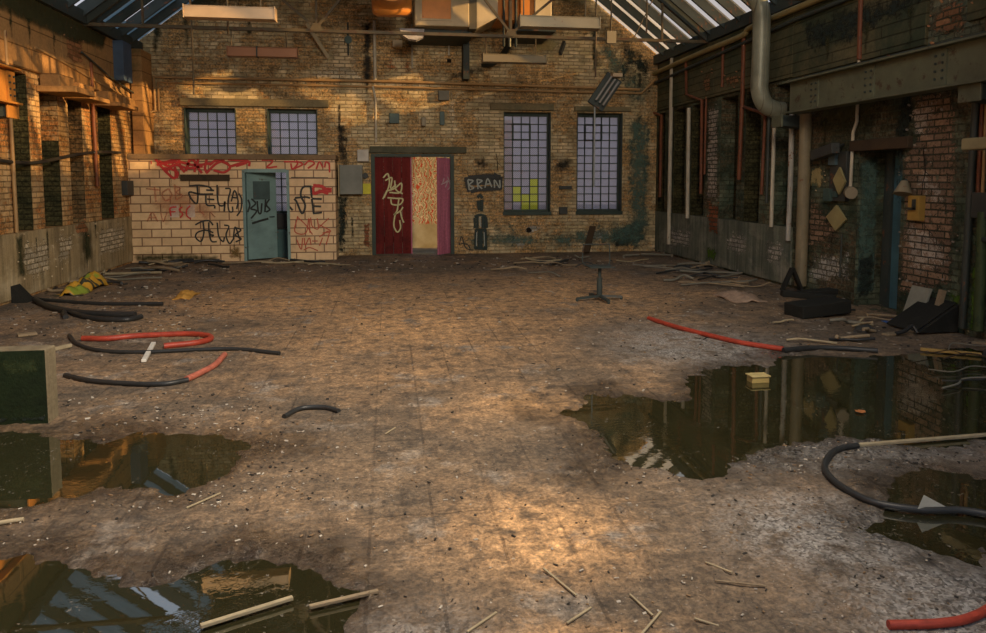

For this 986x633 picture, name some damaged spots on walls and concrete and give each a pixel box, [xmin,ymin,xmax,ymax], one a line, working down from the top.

leakage [805,0,920,57]